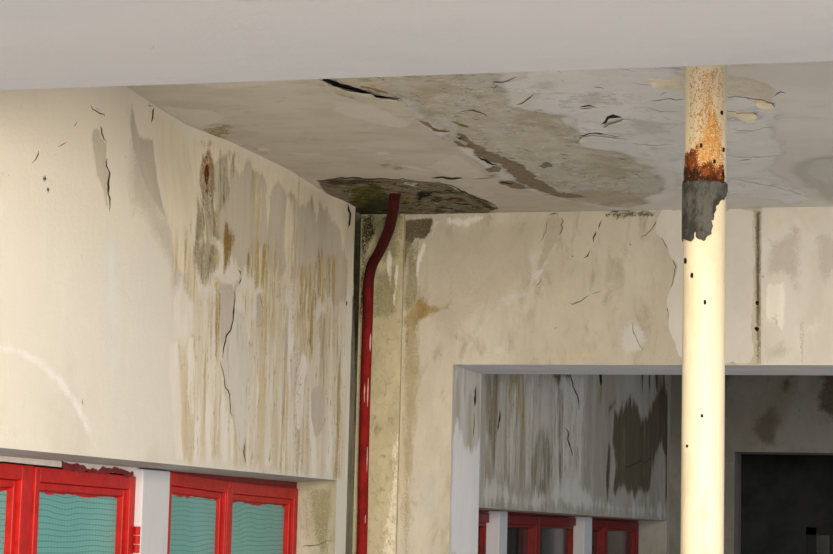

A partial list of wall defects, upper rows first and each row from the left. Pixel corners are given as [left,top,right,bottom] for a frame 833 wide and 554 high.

spalling [379,67,685,209]
rust [683,67,725,183]
peeling [726,76,811,205]
crack [220,271,241,415]
leakage [126,79,672,554]
crack [641,222,676,288]
leakage [816,375,833,422]